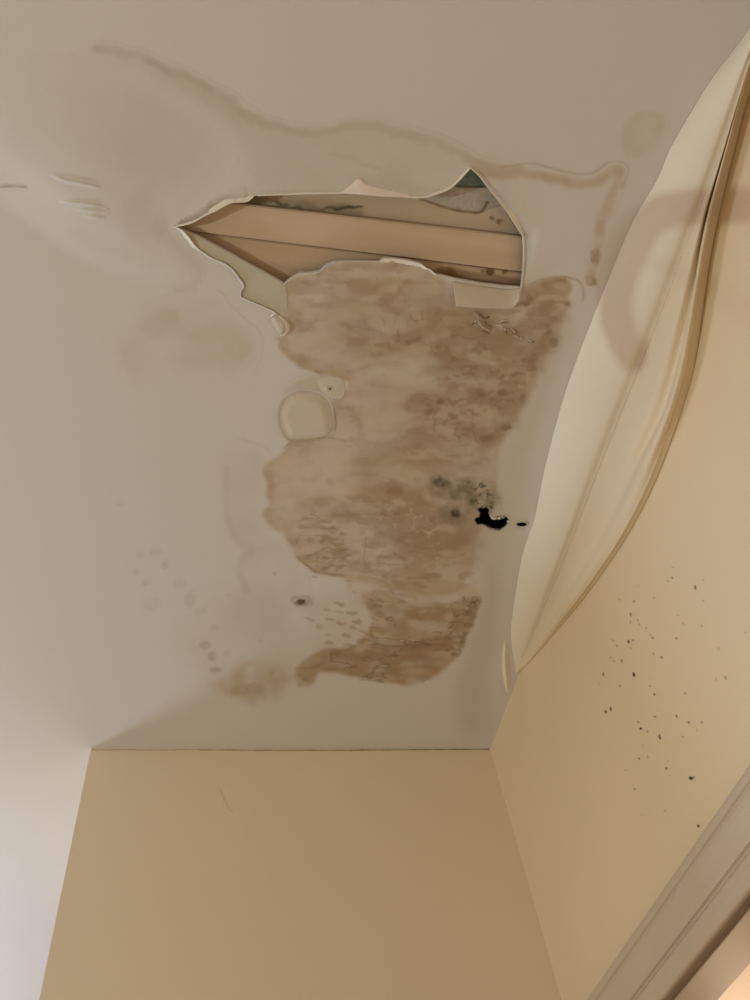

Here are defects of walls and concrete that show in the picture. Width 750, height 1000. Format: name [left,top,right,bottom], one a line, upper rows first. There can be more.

flaking render [185,232,290,336]
water stain [88,41,669,744]